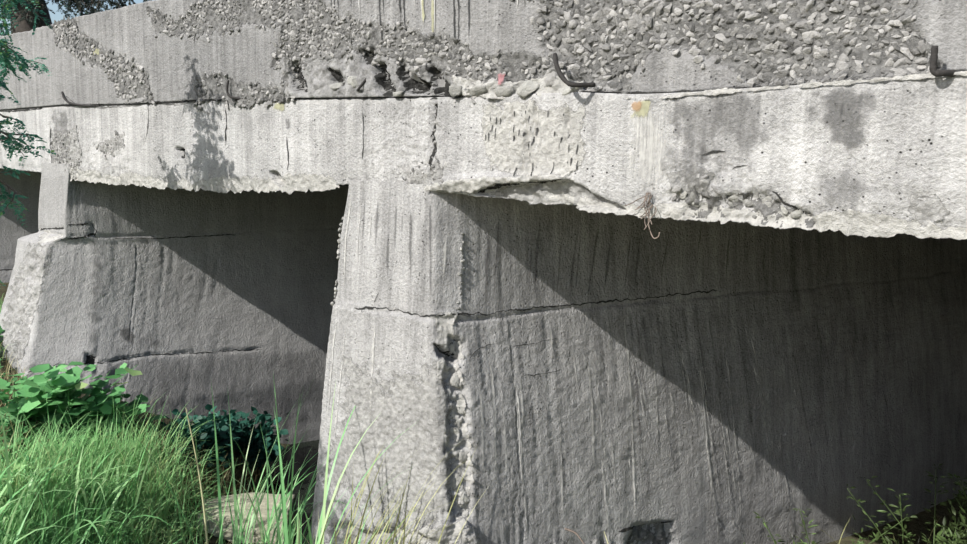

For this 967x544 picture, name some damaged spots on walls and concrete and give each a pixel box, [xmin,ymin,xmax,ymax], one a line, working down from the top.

spalling [50,16,156,104]
crack [429,95,465,168]
spalling [145,0,967,240]
crack [355,289,717,360]
peeling [316,340,481,544]
spalling [627,523,673,544]